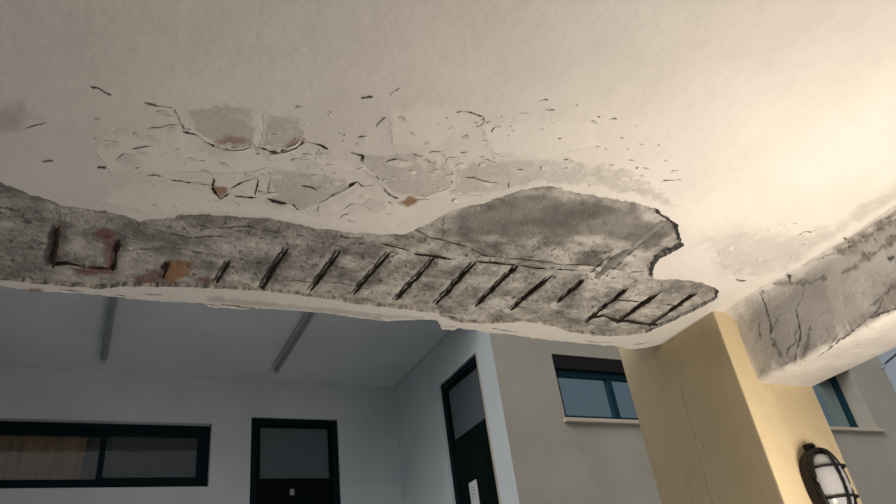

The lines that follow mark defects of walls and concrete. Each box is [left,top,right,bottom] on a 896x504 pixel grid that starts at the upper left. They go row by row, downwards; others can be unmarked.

spalling [0,96,719,345]
rust [137,260,191,283]
crack [759,273,804,362]
crack [819,299,896,357]